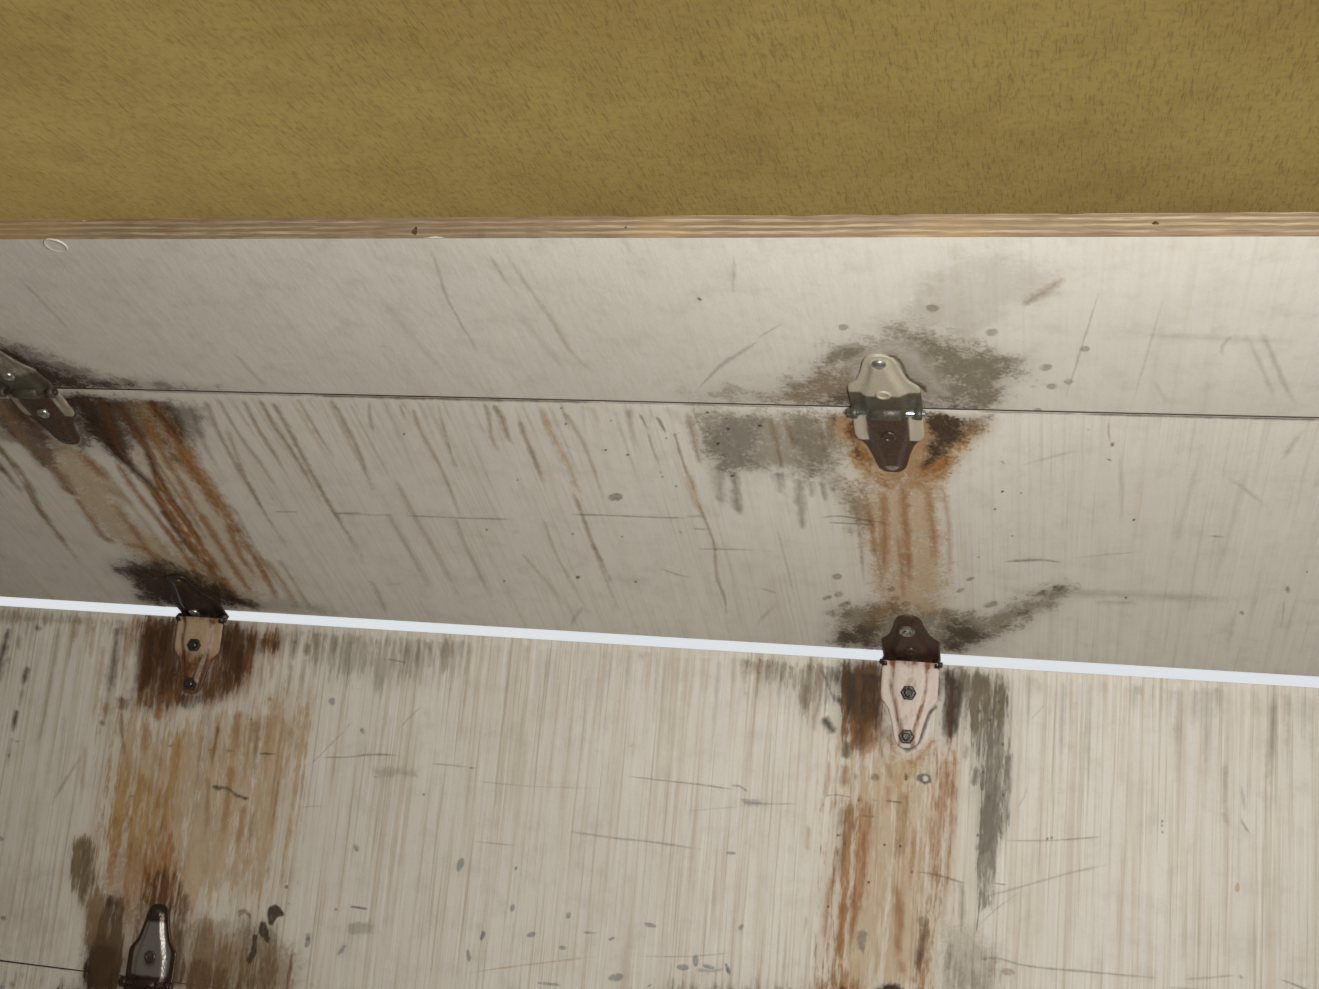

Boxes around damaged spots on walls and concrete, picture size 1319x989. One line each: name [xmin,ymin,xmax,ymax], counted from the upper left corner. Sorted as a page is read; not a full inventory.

corrosion [0,399,73,495]
corrosion [61,394,265,582]
corrosion [836,414,978,564]
corrosion [121,615,280,718]
corrosion [824,661,882,757]
corrosion [905,669,961,763]
corrosion [84,896,140,989]
corrosion [141,828,292,989]
corrosion [827,806,870,947]